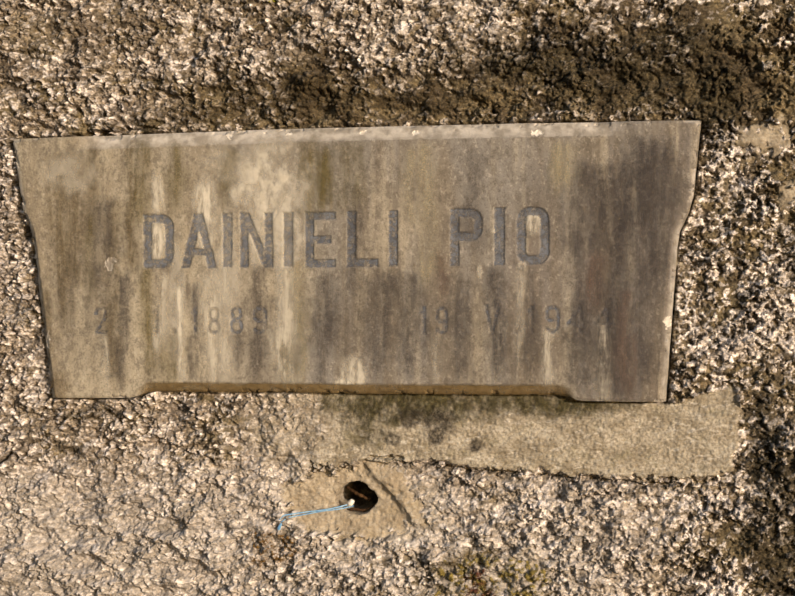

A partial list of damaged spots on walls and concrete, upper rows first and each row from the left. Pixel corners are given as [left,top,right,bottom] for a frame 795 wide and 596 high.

water stain [153,178,163,211]
water stain [153,223,164,259]
water stain [142,256,192,373]
water stain [193,183,215,226]
water stain [193,265,237,377]
water stain [226,146,330,378]
water stain [321,143,657,445]
crack [0,450,25,464]
peeling [279,384,742,554]